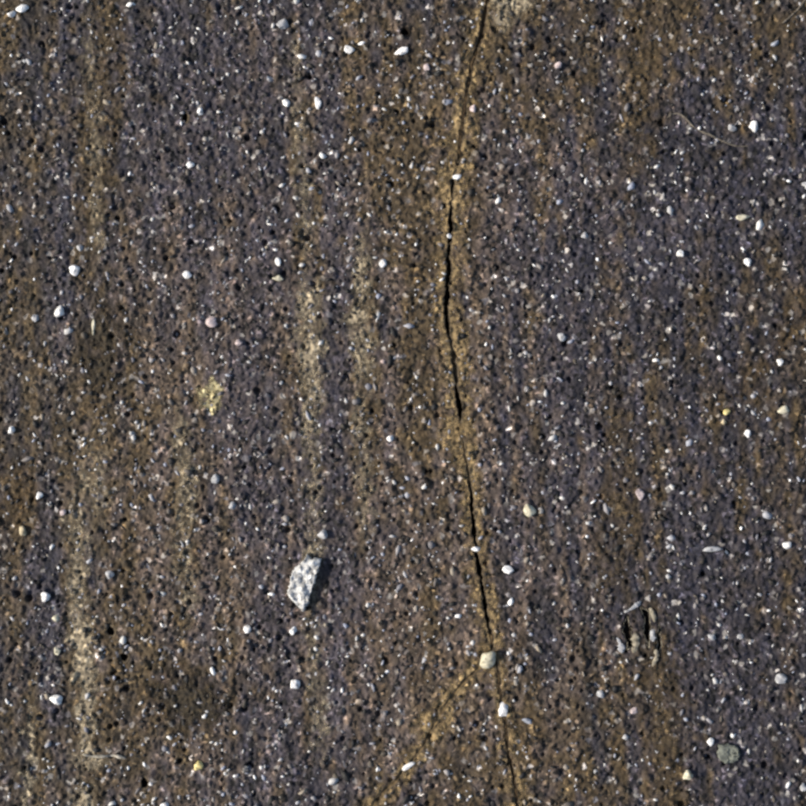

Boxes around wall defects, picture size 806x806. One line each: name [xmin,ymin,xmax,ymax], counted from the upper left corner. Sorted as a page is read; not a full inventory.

crack [370,0,520,806]